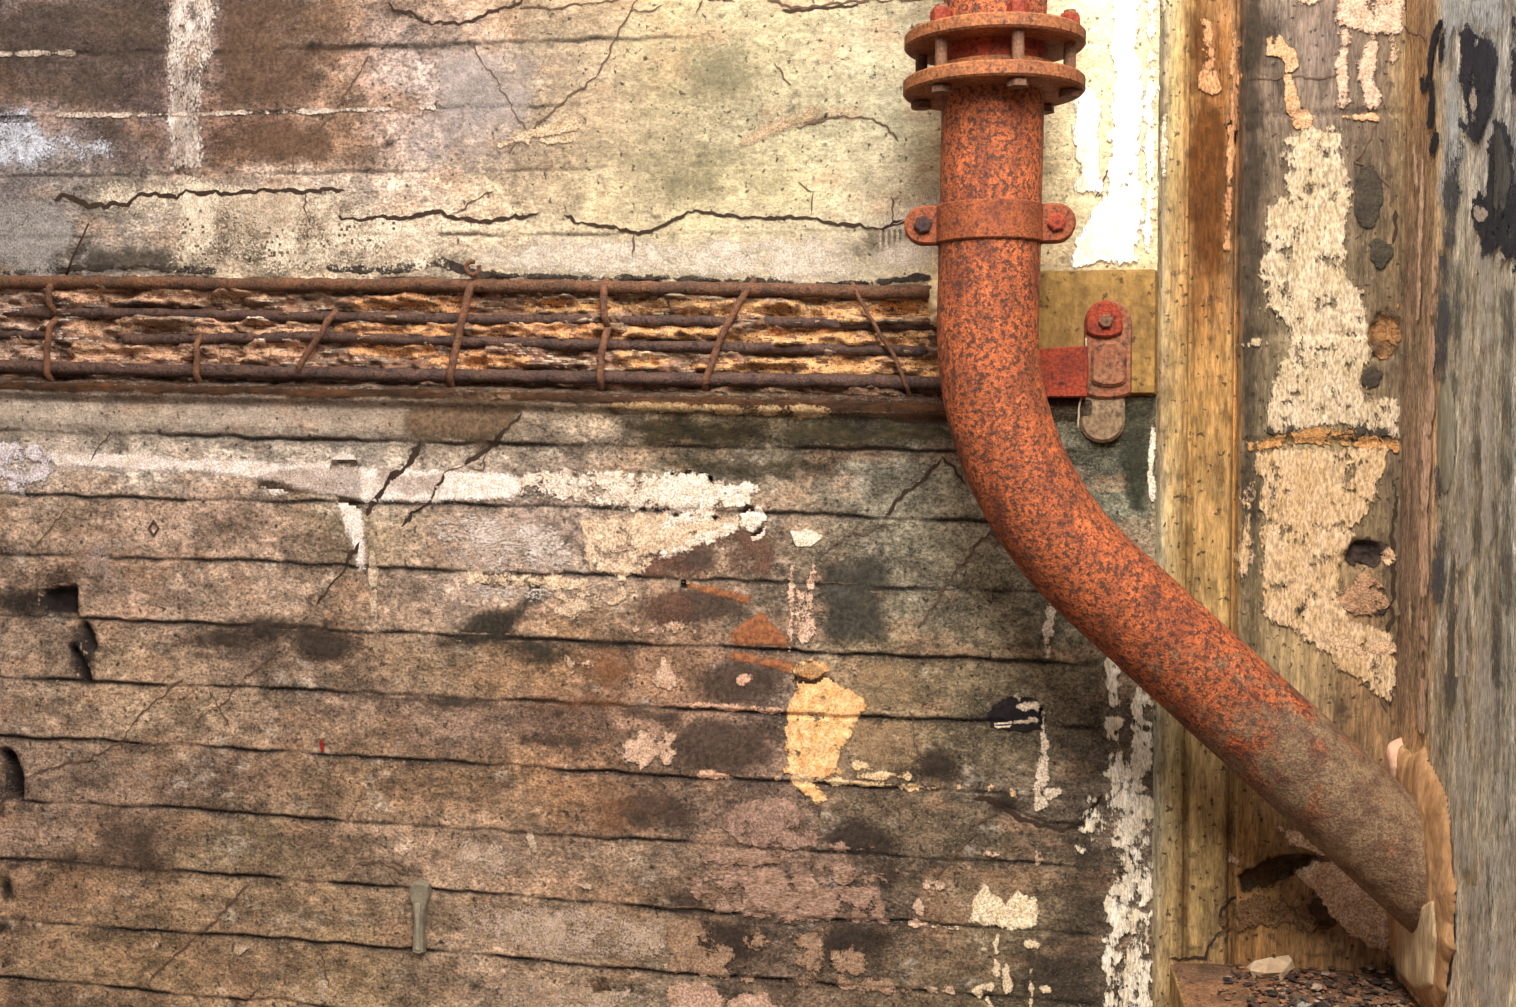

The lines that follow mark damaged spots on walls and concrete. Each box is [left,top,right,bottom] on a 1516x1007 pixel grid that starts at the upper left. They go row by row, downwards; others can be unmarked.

crack [54,56,905,257]
crack [388,0,732,153]
crack [768,0,920,13]
spalling [0,215,943,398]
corrosion [0,378,947,423]
peeling [1233,0,1516,734]
crack [316,412,522,605]
corrosion [688,583,797,673]
peeling [423,465,926,1007]
peeling [985,693,1062,812]
peeling [1074,658,1155,1007]
peeling [931,884,1051,1007]